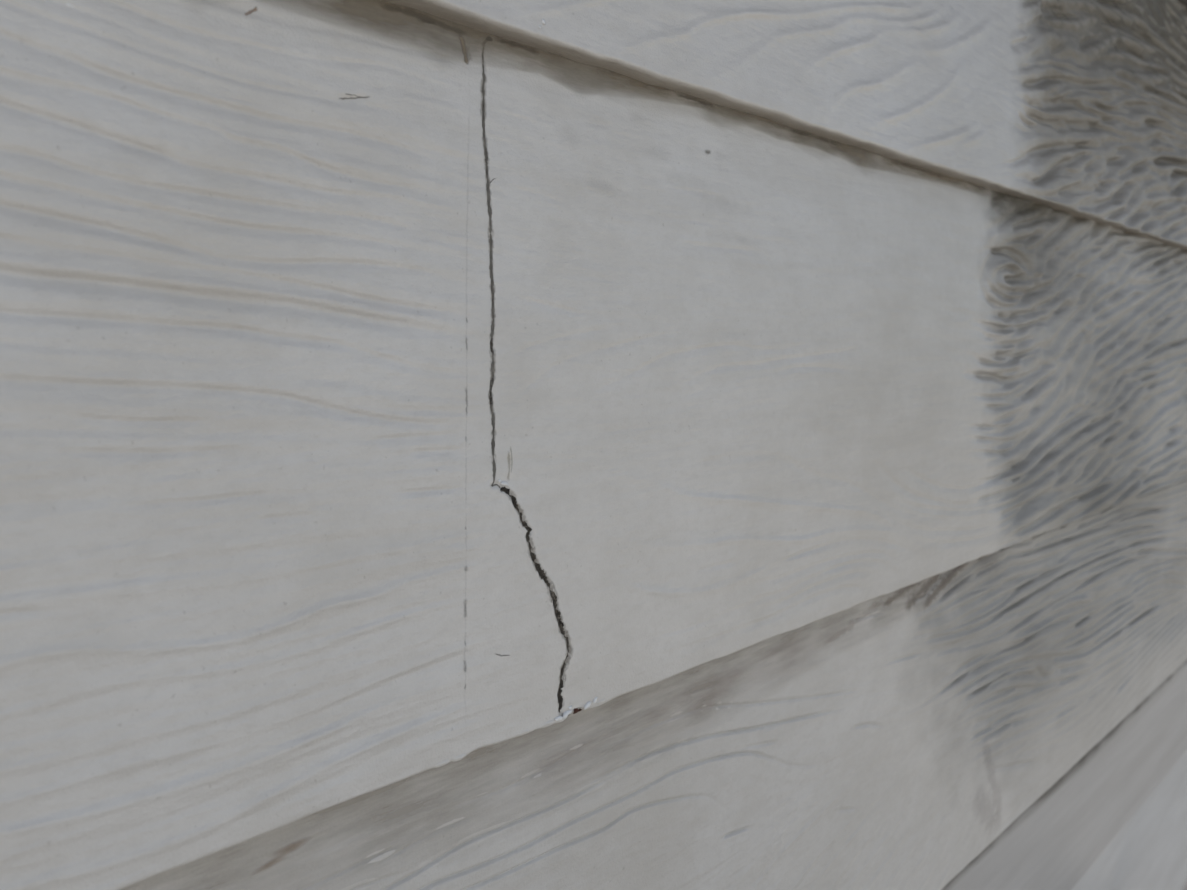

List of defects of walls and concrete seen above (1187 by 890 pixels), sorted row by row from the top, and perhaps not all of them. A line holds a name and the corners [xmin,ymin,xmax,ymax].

crack [481,36,571,716]